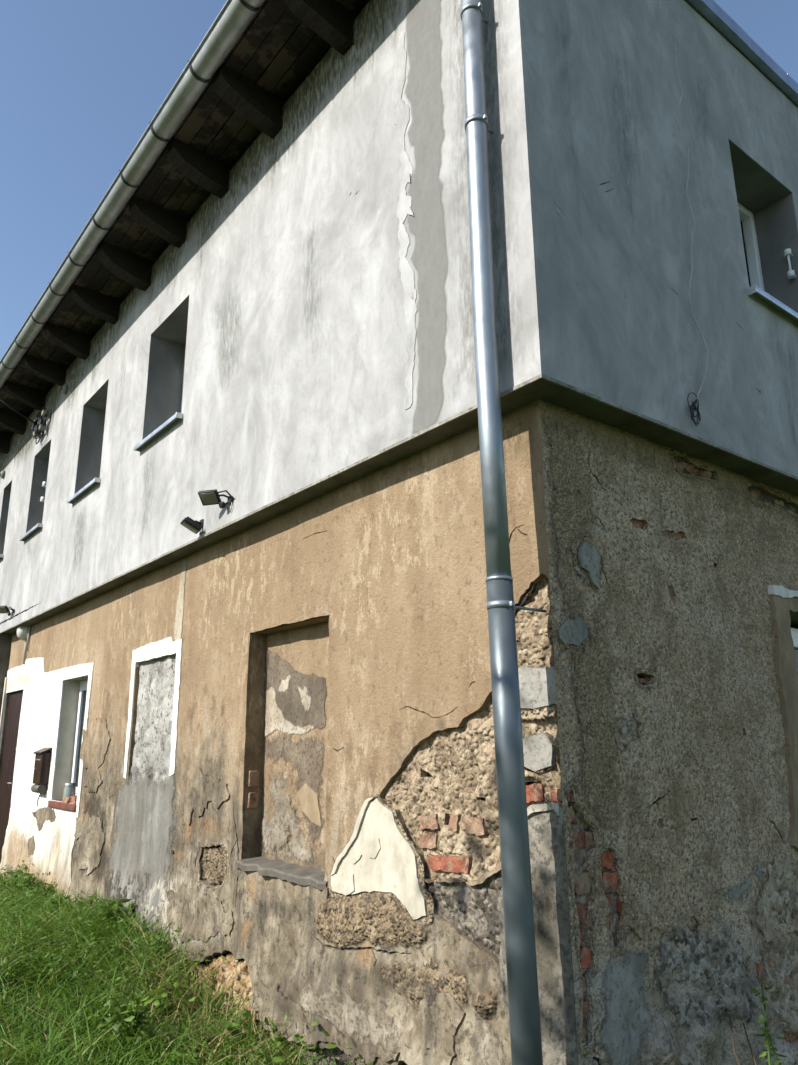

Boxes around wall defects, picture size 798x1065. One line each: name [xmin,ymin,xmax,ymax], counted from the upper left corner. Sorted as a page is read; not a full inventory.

peeling [395,31,418,410]
flaking render [515,575,591,668]
peeling [260,649,326,862]
flaking render [27,806,56,857]
flaking render [74,811,106,875]
damp [82,800,104,821]
damp [82,851,182,932]
flaking render [167,842,234,943]
flaking render [310,698,502,959]
flaking render [521,704,635,1058]
flaking render [249,980,401,1065]
flaking render [380,955,468,1065]